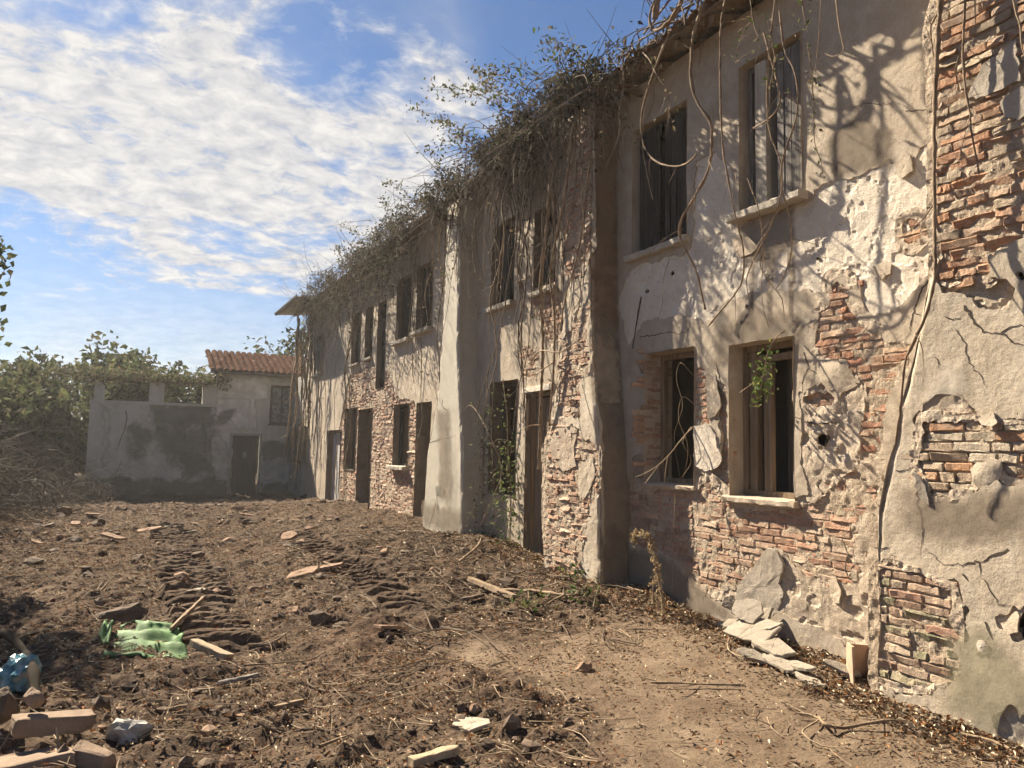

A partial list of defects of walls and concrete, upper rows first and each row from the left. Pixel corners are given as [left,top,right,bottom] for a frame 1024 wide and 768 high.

flaking render [517,116,603,576]
flaking render [618,0,1024,696]
crack [945,305,1024,397]
flaking render [339,362,419,516]
crack [896,467,1011,639]